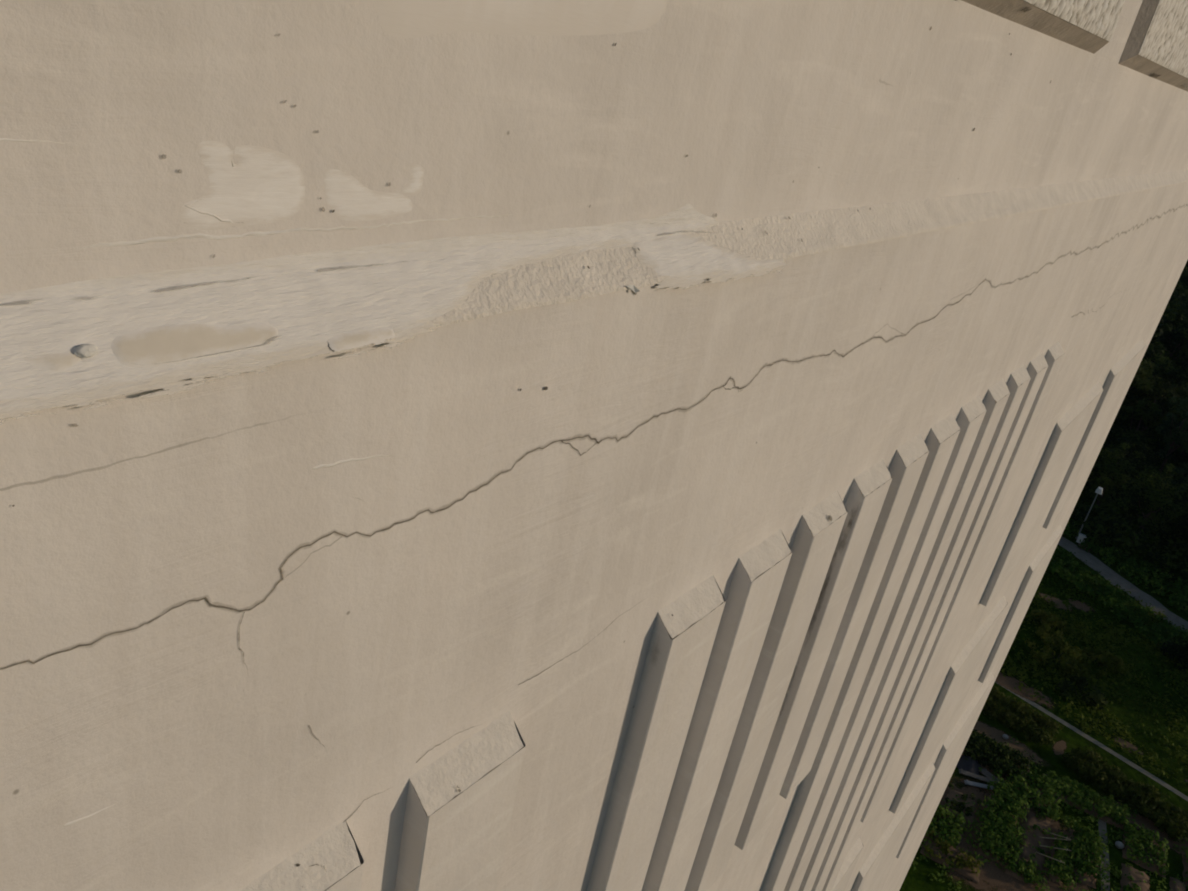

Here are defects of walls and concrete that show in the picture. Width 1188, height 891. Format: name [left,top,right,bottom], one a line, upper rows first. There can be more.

peeling [111,323,278,368]
peeling [328,327,396,352]
crack [1,283,992,669]